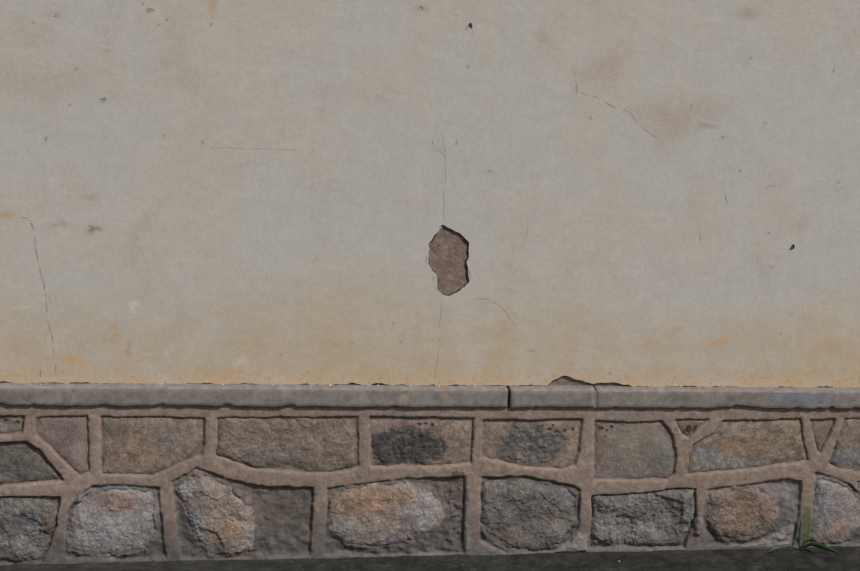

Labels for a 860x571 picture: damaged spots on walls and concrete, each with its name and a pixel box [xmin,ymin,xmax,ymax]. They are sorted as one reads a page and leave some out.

crack [21,217,56,377]
water stain [0,226,860,407]
spalling [426,225,472,296]